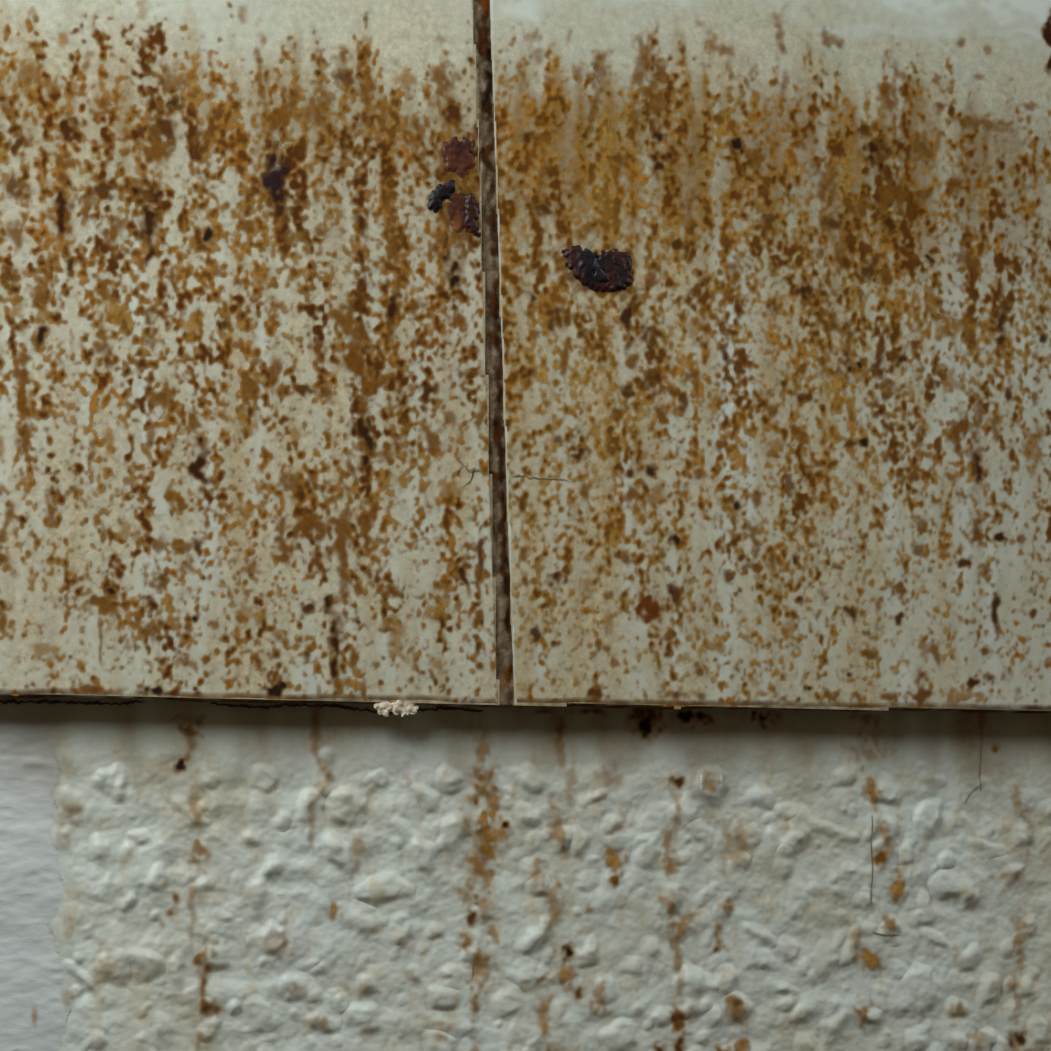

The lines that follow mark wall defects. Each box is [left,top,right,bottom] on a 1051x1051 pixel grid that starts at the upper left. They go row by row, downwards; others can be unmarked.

water stain [0,0,182,160]
water stain [245,0,479,173]
water stain [491,30,546,180]
water stain [584,116,682,211]
water stain [628,0,1051,233]
rust [0,0,1051,750]
crack [457,458,483,487]
rust [470,768,509,886]
rust [461,911,489,1013]
rust [538,999,550,1032]
rust [558,943,581,999]
rust [1009,1031,1029,1051]